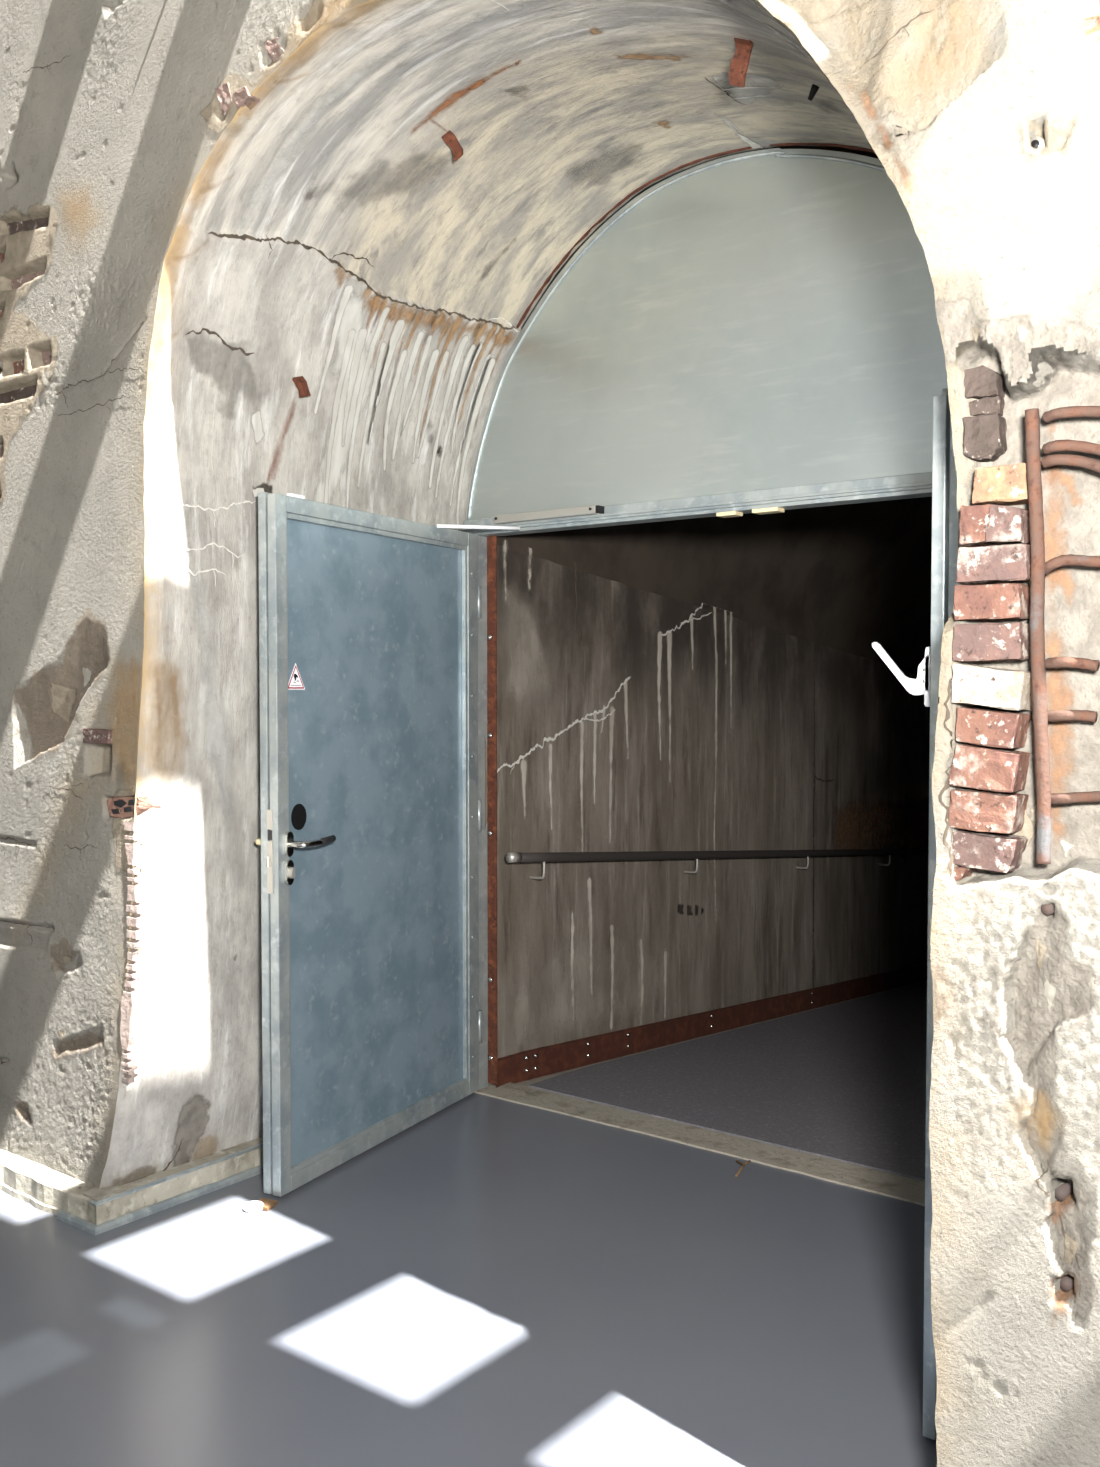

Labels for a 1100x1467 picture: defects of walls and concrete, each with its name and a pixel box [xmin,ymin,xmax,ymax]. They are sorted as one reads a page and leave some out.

spalling [0,203,59,502]
crack [208,231,520,332]
corrosion [362,288,513,438]
spalling [936,298,1100,876]
corrosion [1044,513,1072,594]
spalling [14,610,109,760]
corrosion [1046,642,1072,833]
spalling [970,869,990,882]
spalling [992,906,1098,1319]